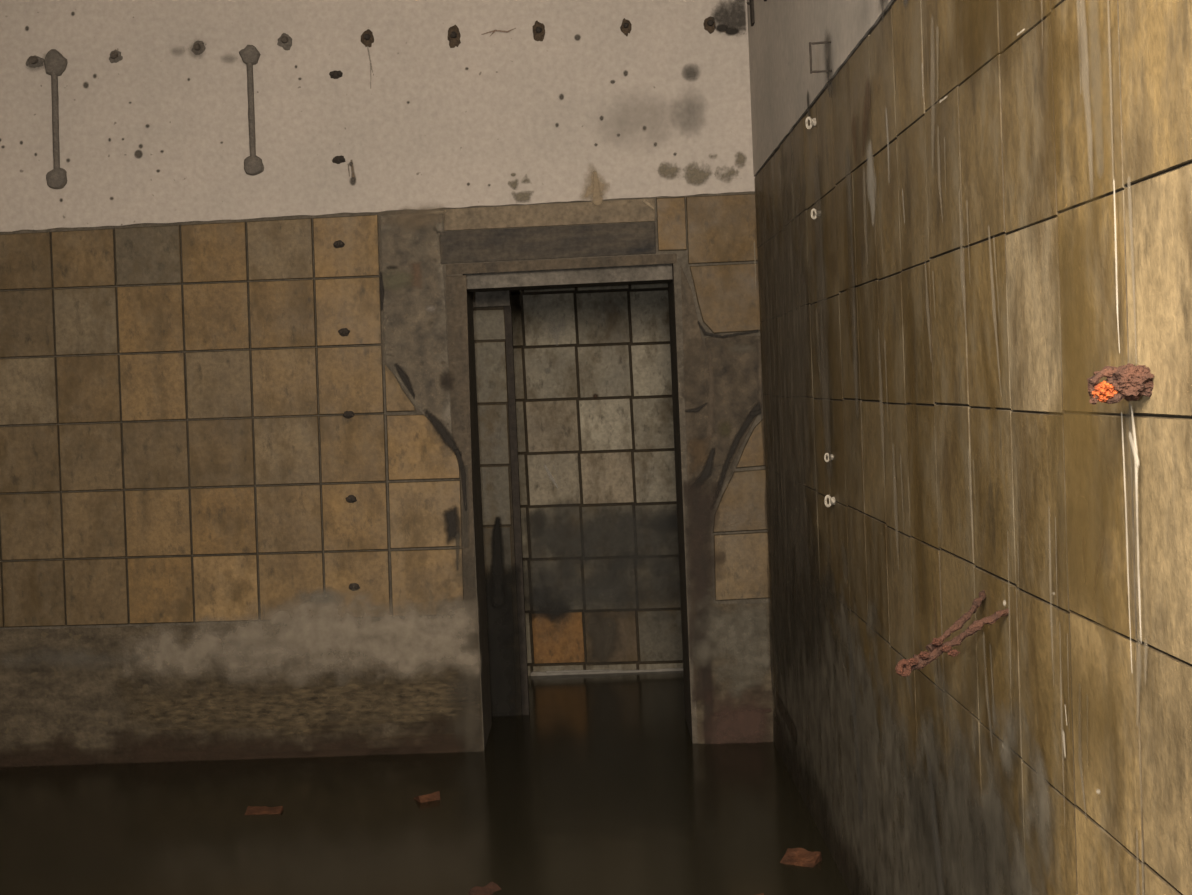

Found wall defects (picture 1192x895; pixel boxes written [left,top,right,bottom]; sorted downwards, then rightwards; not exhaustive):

crack [378,272,386,311]
crack [698,321,758,338]
corrosion [1089,380,1118,405]
crack [395,364,467,511]
crack [694,403,761,503]